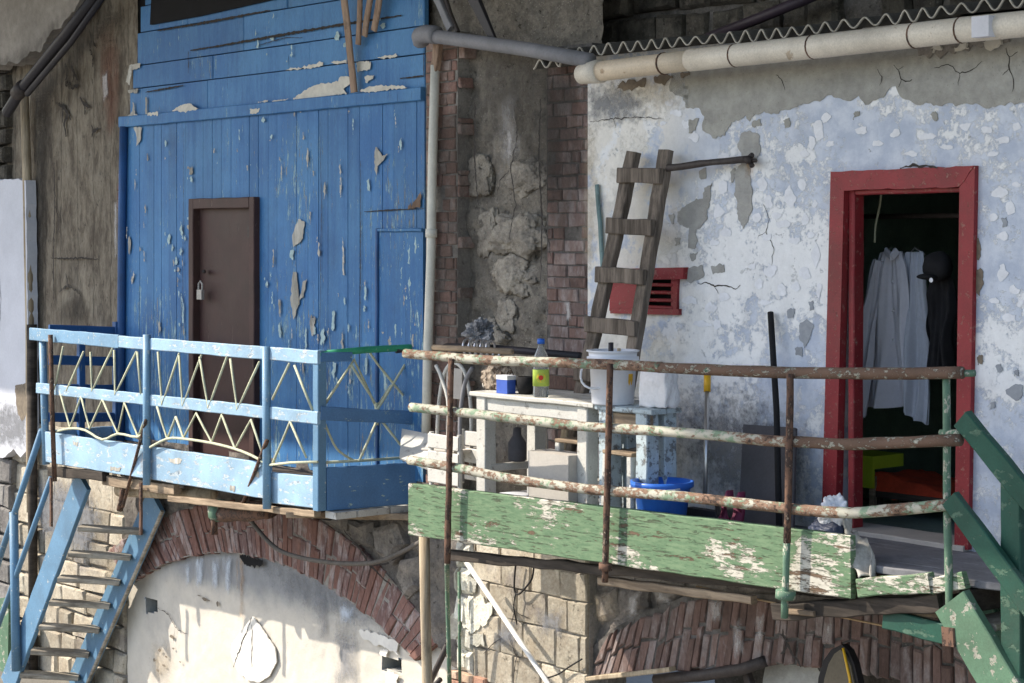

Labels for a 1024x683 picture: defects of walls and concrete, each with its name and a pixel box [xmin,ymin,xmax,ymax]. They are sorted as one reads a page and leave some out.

peeling [126,63,158,146]
peeling [172,103,198,113]
peeling [250,45,406,123]
peeling [367,137,402,191]
crack [473,99,551,281]
crack [590,117,658,128]
peeling [617,37,1024,283]
crack [935,49,1017,91]
peeling [264,212,349,350]
peeling [976,238,1024,322]
peeling [787,301,814,356]
spalling [996,364,1023,401]